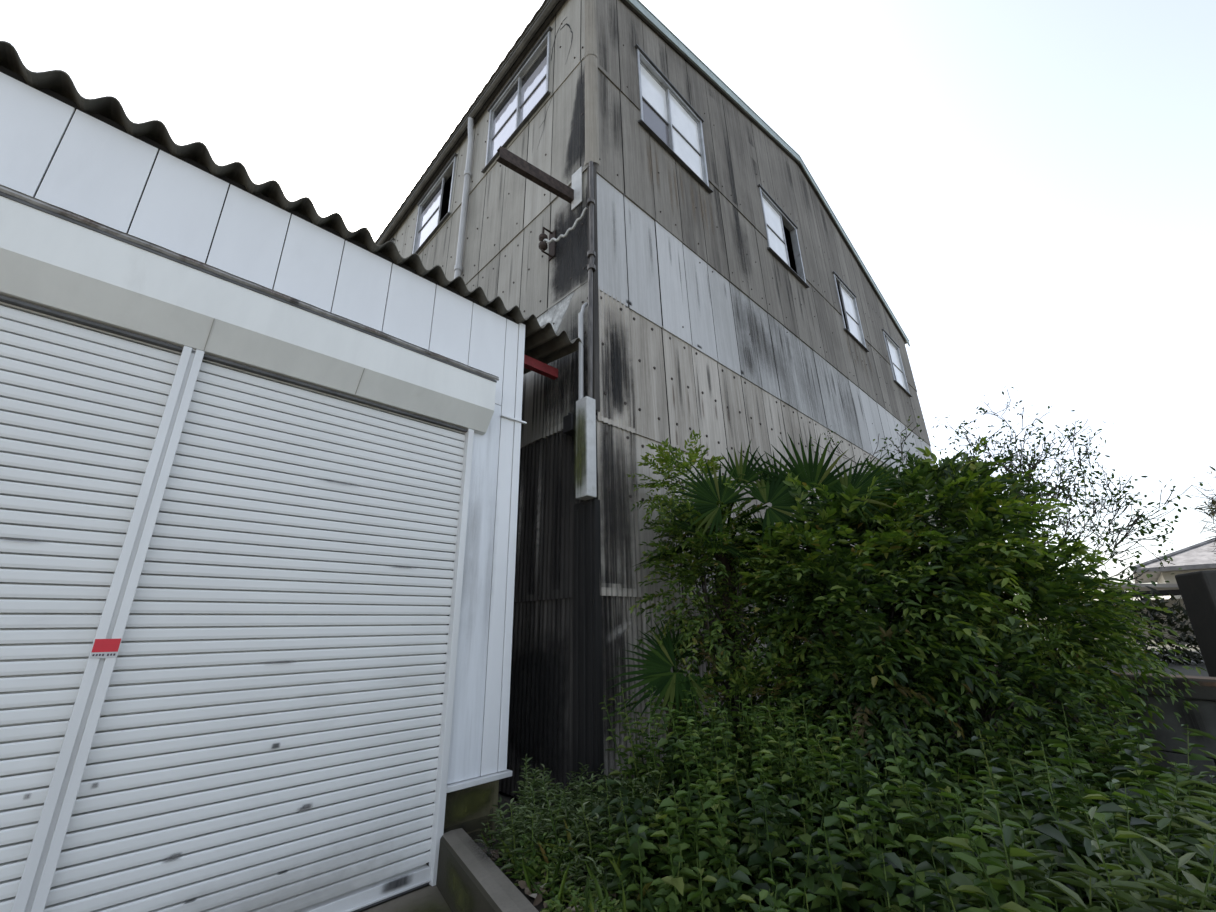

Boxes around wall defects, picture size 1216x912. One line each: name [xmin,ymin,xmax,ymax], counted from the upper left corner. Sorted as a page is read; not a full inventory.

damp [565,72,585,172]
damp [521,193,588,485]
damp [601,324,636,734]